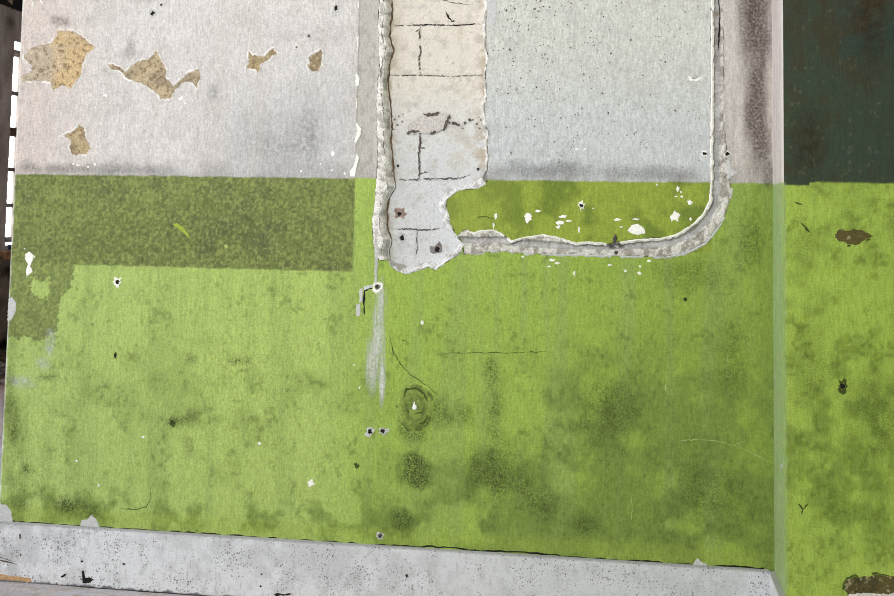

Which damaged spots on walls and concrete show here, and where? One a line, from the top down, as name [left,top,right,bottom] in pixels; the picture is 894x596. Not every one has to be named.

peeling [21,28,95,91]
peeling [107,48,201,104]
peeling [245,47,280,75]
water stain [745,69,769,158]
peeling [61,123,96,168]
spalling [356,0,737,316]
peeling [835,229,873,247]
water stain [367,288,385,398]
water stain [401,454,428,488]
peeling [842,572,894,596]